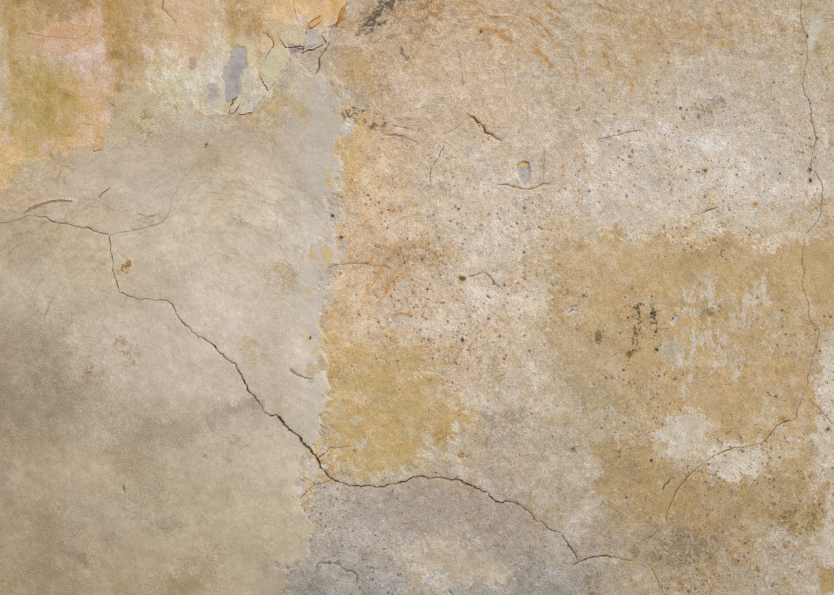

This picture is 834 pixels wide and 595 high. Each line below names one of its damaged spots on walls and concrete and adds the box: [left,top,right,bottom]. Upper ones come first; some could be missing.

crack [262,0,346,74]
peeling [0,0,347,154]
crack [228,96,241,115]
crack [429,112,503,183]
crack [598,129,643,139]
crack [640,0,834,543]
crack [0,165,634,565]
leakage [589,329,609,347]
mould [630,303,660,355]
crack [316,562,358,583]